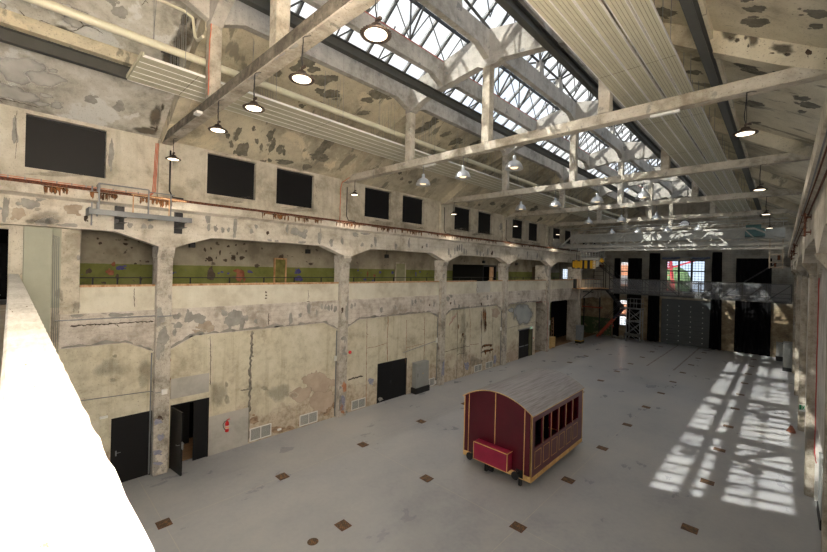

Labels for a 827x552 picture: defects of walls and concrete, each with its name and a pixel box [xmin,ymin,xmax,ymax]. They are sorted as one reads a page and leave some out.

water stain [723,32,758,47]
water stain [771,45,793,56]
peeling [229,129,256,156]
peeling [262,128,286,161]
corrosion [43,185,68,195]
corrosion [89,191,118,200]
corrosion [140,197,174,208]
peeling [289,371,346,416]